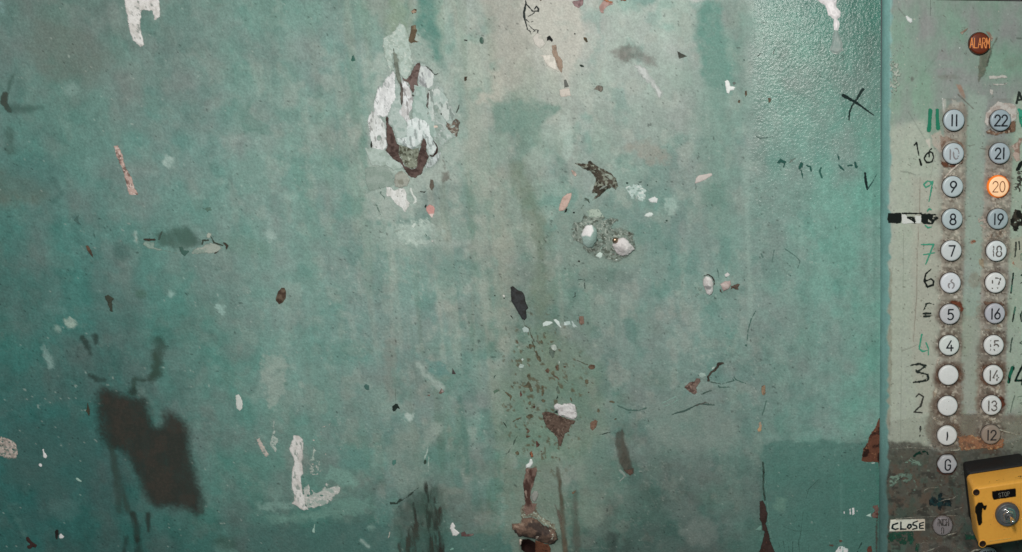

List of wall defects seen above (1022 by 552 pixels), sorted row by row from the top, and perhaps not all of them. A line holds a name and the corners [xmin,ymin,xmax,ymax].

peeling [125,0,160,47]
peeling [365,9,460,217]
spalling [559,193,635,262]
spalling [0,437,18,459]
leakage [89,375,200,542]
flaking render [289,435,326,510]
rust [862,418,880,464]
leakage [398,484,444,552]